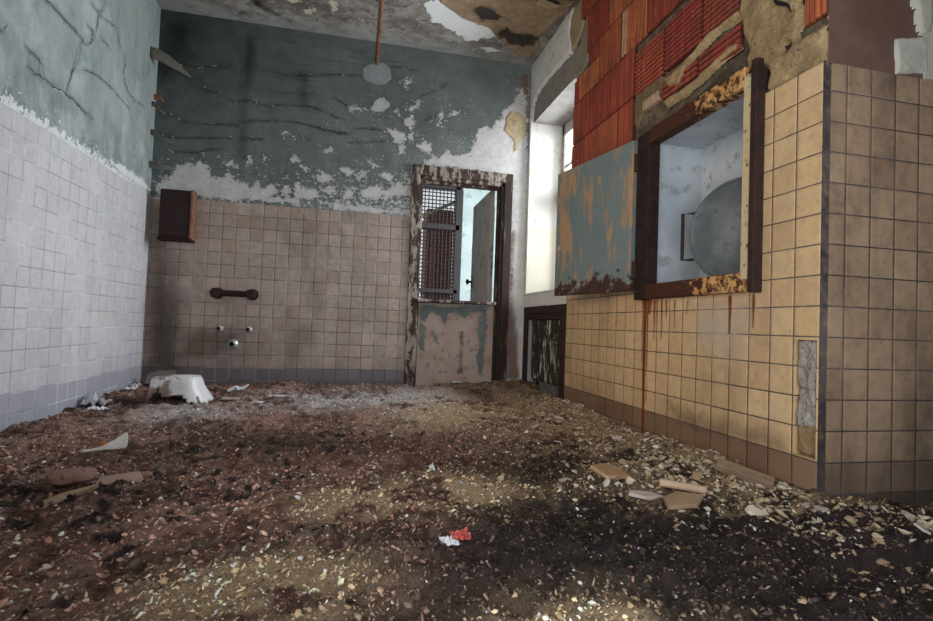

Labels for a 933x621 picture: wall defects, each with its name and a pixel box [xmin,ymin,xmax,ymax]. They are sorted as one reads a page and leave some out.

crack [29,0,144,120]
peeling [150,46,192,78]
crack [167,62,391,153]
crack [774,0,793,12]
flaking render [894,0,933,74]
peeling [26,112,412,216]
flaking render [348,0,829,381]
corrosion [641,300,675,432]
peeling [796,340,817,457]